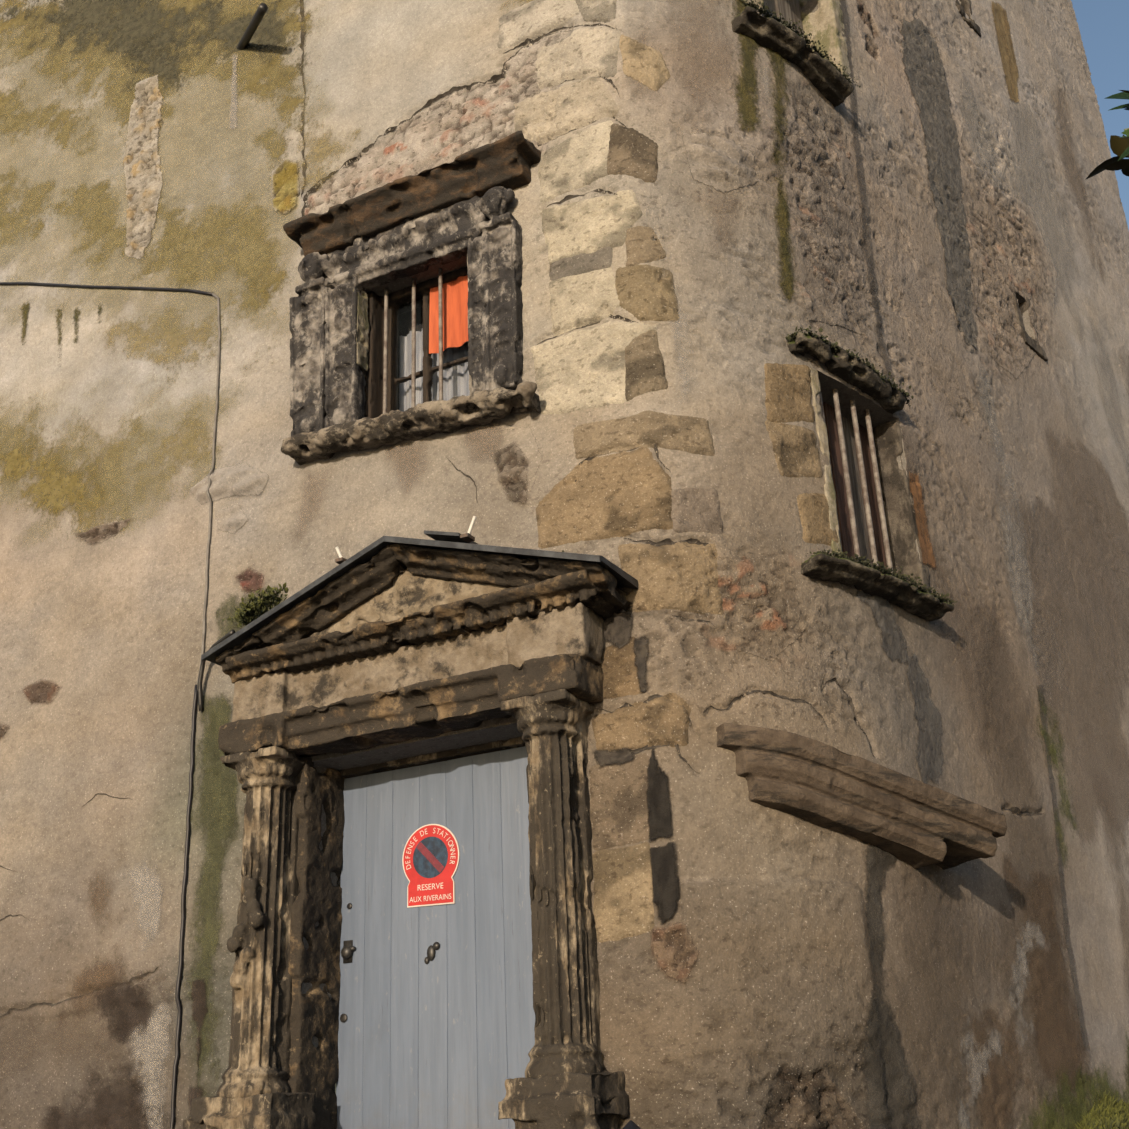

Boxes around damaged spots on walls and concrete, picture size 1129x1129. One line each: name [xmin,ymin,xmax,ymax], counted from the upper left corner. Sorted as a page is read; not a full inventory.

flaking render [123,75,163,259]
flaking render [271,24,574,215]
leakage [760,48,794,299]
leakage [56,308,80,344]
flaking render [76,518,131,545]
leakage [1001,513,1062,707]
flaking render [21,679,62,703]
crack [595,694,662,713]
crack [629,677,875,773]
crack [0,967,158,1018]
flaking render [652,922,699,983]
leakage [43,959,168,1129]